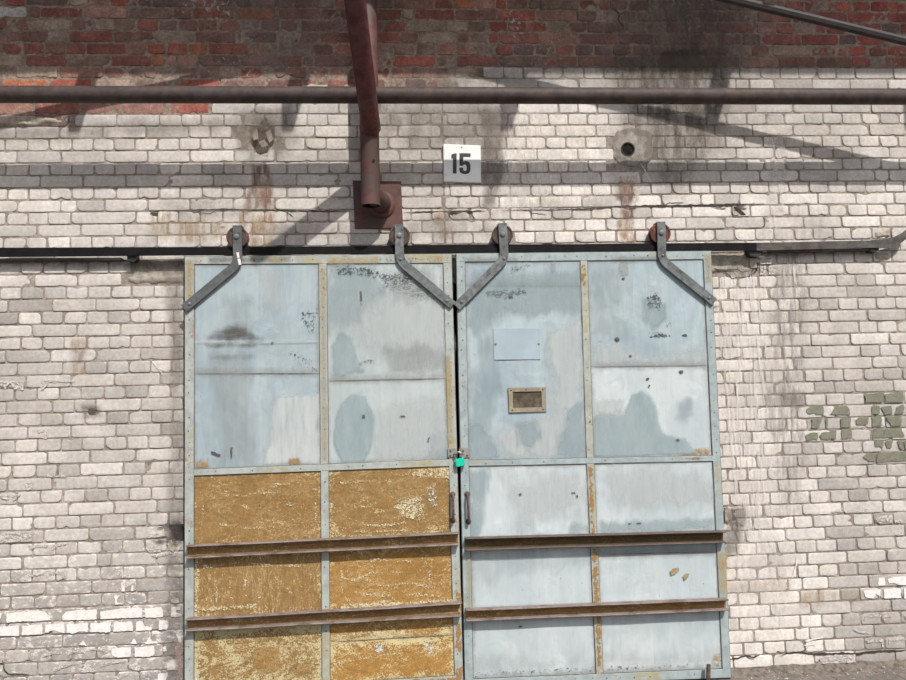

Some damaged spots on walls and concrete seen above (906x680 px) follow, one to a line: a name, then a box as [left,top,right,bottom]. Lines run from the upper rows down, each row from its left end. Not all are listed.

rust [241,166,273,245]
rust [617,176,639,241]
peeling [0,531,66,550]
peeling [147,526,184,557]
peeling [863,564,906,599]
peeling [0,569,182,680]
peeling [819,654,856,664]